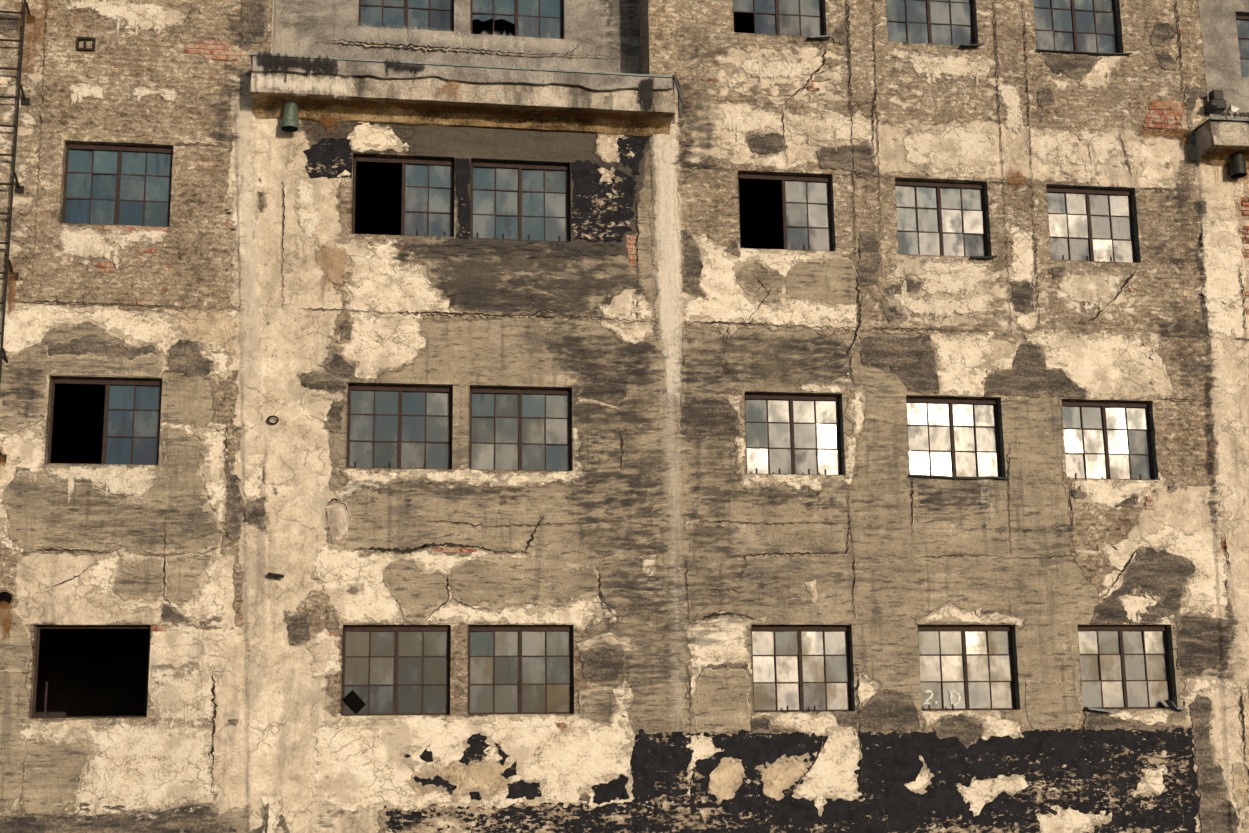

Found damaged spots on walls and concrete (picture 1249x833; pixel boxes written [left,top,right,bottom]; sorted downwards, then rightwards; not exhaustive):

flaking render [0,171,264,380]
flaking render [294,121,459,379]
leakage [555,73,721,400]
crack [281,0,1046,395]
flaking render [679,236,869,340]
flaking render [879,228,1158,399]
flaking render [307,543,617,679]
crack [355,514,664,622]
crack [685,491,856,625]
flaking render [18,661,233,820]
crack [208,671,218,793]
peeling [311,612,1249,833]